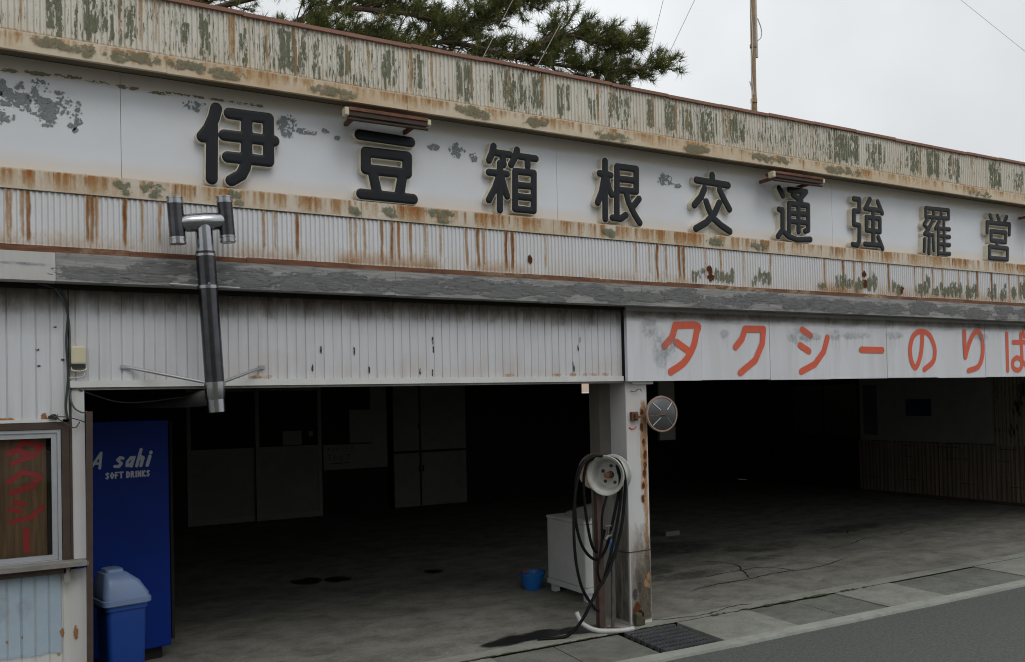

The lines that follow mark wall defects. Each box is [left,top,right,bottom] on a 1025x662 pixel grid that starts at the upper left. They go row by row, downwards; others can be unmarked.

peeling [0,68,267,133]
peeling [277,114,340,140]
peeling [279,27,358,100]
peeling [381,50,397,90]
peeling [428,142,477,162]
peeling [455,60,570,128]
peeling [588,91,633,143]
peeling [647,98,789,165]
corrosion [1,168,35,241]
corrosion [48,172,117,241]
peeling [216,264,1025,320]
corrosion [640,402,649,553]